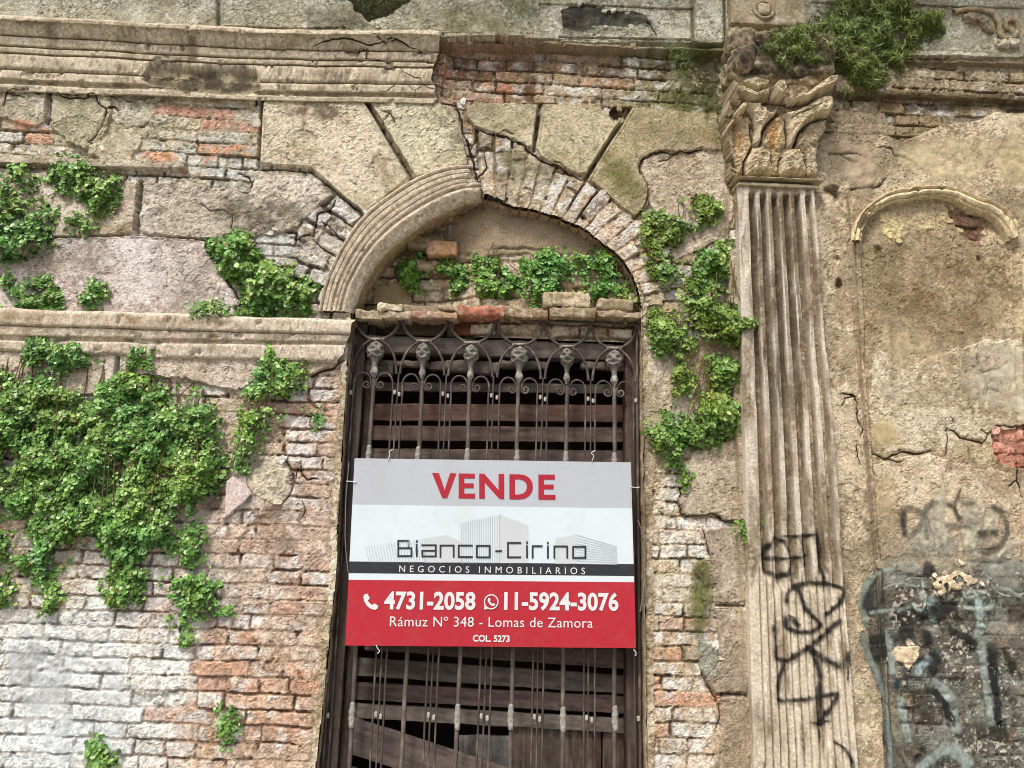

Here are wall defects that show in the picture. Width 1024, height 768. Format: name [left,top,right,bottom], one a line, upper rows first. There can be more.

flaking render [441,0,725,126]
crack [57,92,118,142]
crack [313,33,584,213]
flaking render [880,203,986,246]
crack [841,392,1023,463]
flaking render [990,424,1024,469]
flaking render [873,536,1024,768]